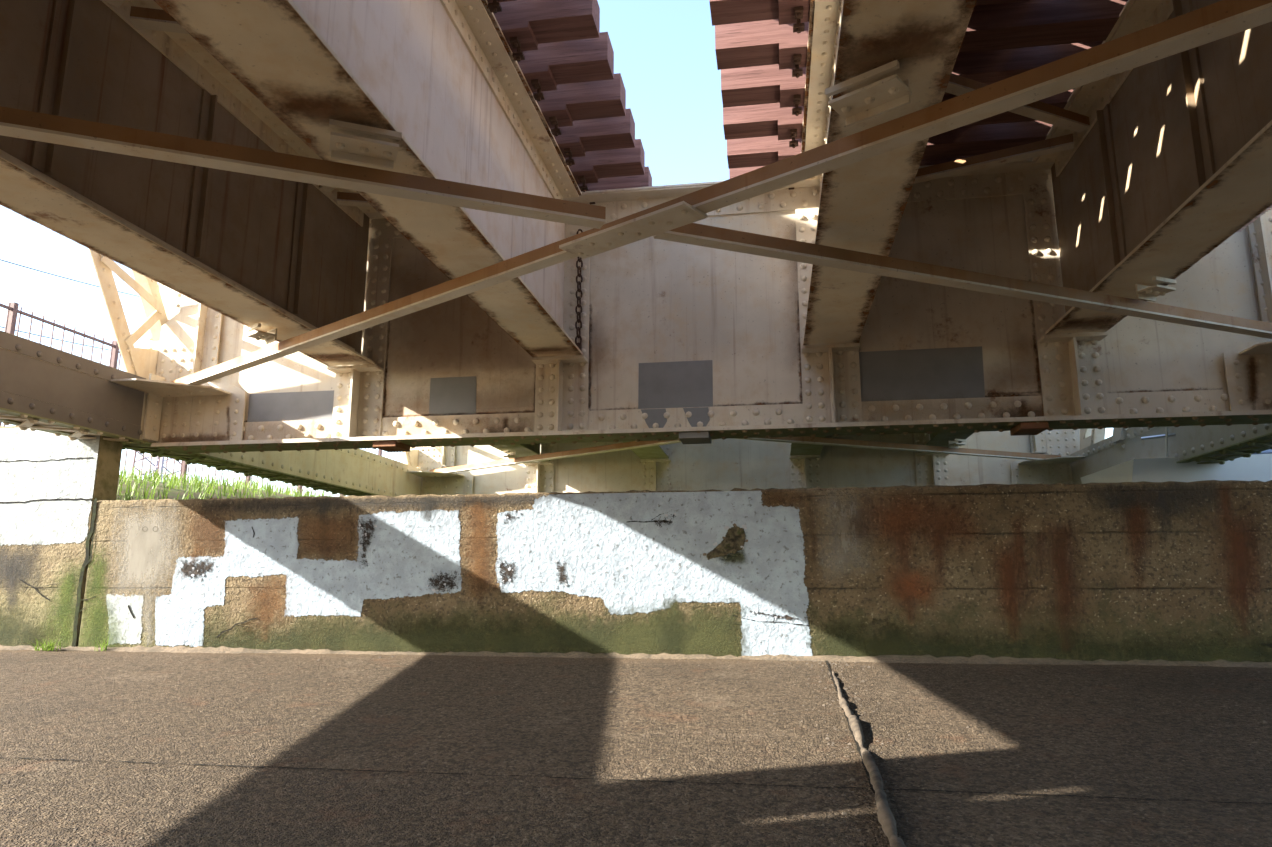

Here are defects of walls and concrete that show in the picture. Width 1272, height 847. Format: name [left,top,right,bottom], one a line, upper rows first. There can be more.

rust [481,0,581,196]
rust [801,0,815,153]
rust [827,0,965,143]
rust [815,171,832,244]
rust [722,264,819,406]
crack [0,455,93,463]
crack [0,493,97,647]
peeling [179,558,216,581]
peeling [358,516,380,566]
peeling [427,571,459,592]
peeling [497,557,518,589]